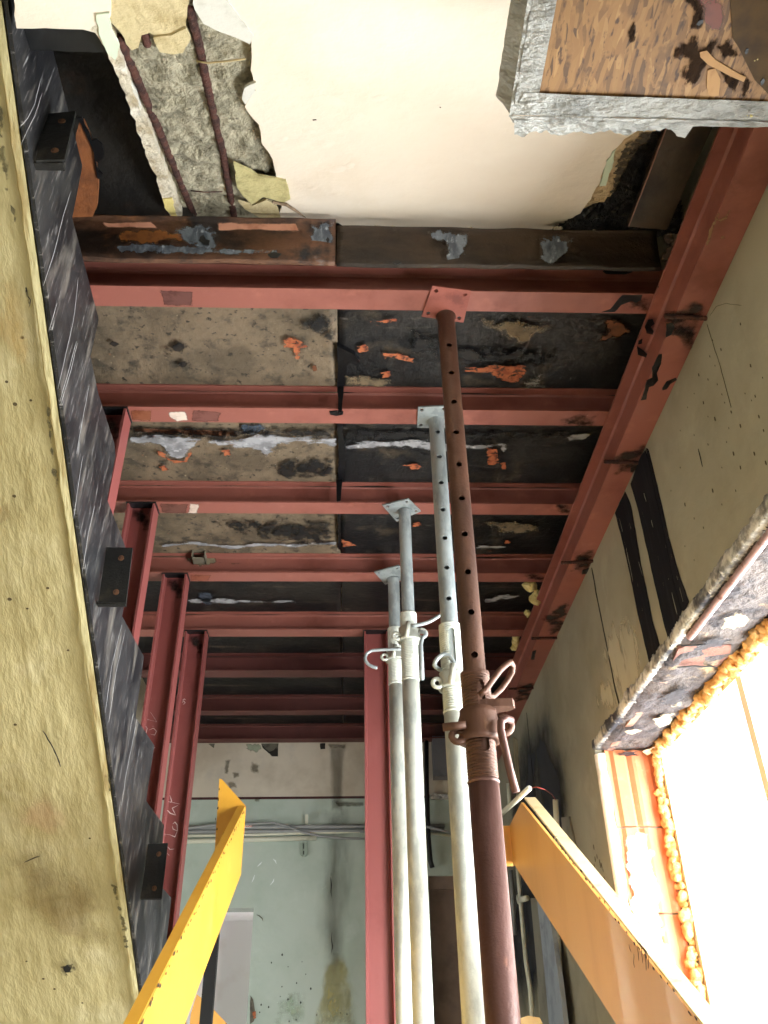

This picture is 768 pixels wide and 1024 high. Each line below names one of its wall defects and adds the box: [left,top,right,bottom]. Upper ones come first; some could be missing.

spalling [96,0,306,218]
spalling [583,130,656,209]
corrosion [119,229,183,244]
corrosion [600,319,631,341]